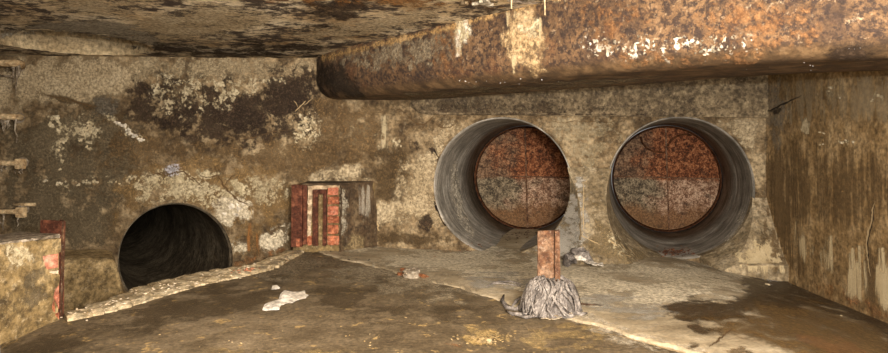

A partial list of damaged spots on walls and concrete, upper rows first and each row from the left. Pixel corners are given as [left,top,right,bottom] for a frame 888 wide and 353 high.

corrosion [708,3,817,65]
leakage [0,0,648,345]
leakage [522,115,888,353]